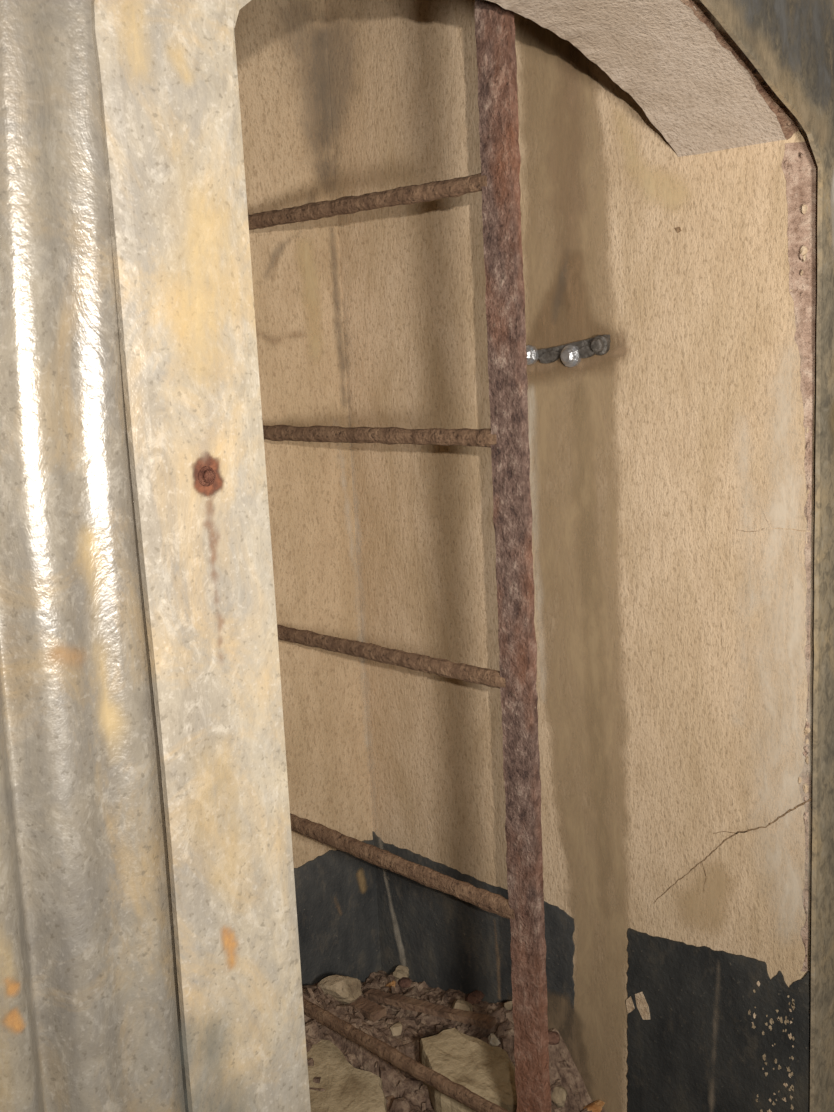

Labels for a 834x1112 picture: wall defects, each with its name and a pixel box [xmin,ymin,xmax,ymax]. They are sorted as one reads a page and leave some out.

corrosion [193,453,223,496]
leakage [519,21,628,1112]
peeling [357,870,366,892]
crack [654,798,812,903]
peeling [626,992,650,1020]
peeling [748,981,795,1112]